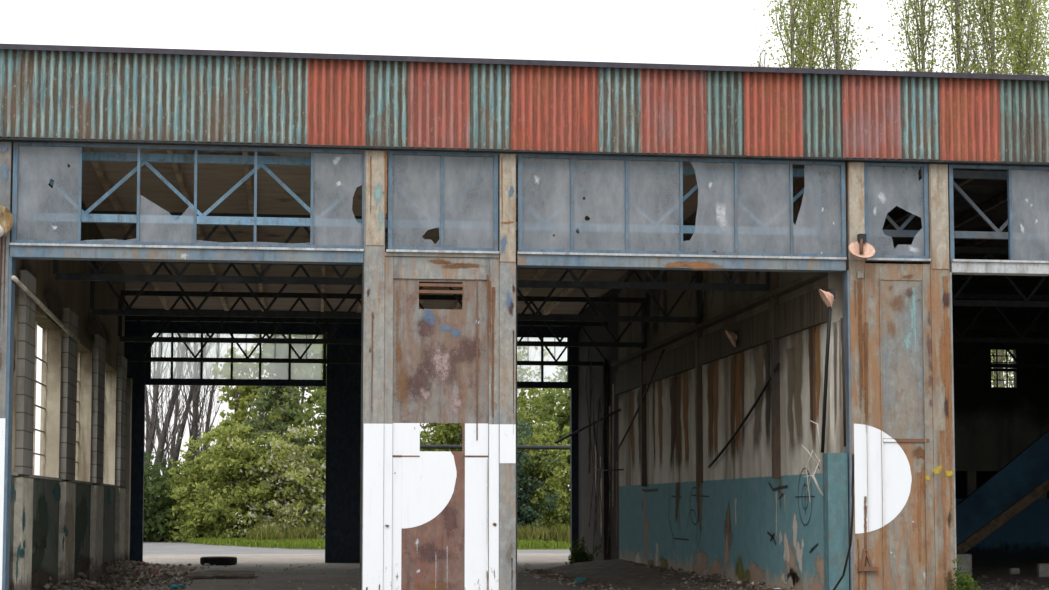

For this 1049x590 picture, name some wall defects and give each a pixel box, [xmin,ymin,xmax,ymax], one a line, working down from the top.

corrosion [0,236,15,319]
peeling [433,345,449,380]
leakage [754,343,771,447]
leakage [787,331,802,449]
corrosion [854,280,868,420]
corrosion [927,276,953,590]
leakage [31,569,53,590]
peeling [776,492,824,590]
corrosion [857,496,867,590]
corrosion [914,447,925,560]